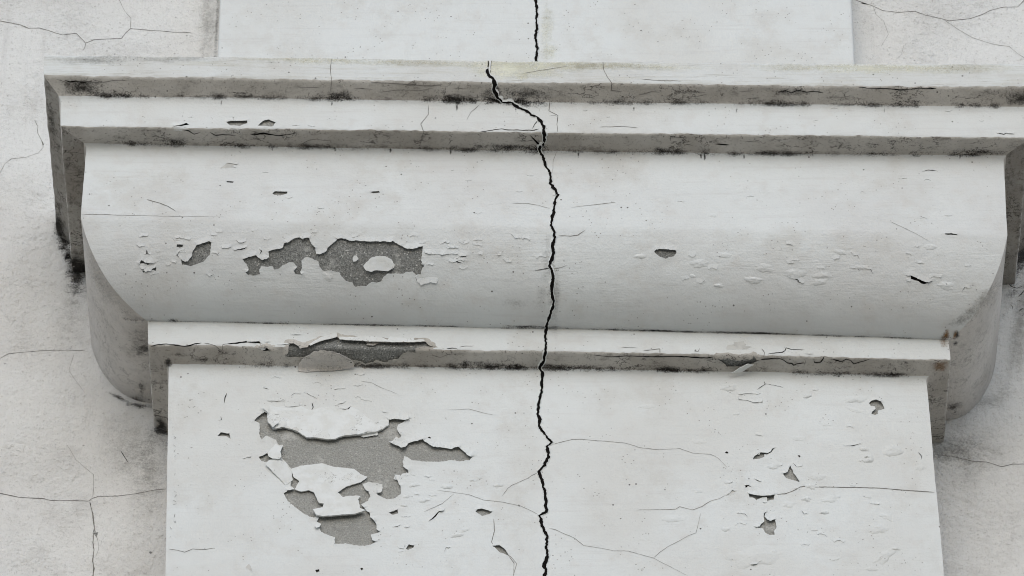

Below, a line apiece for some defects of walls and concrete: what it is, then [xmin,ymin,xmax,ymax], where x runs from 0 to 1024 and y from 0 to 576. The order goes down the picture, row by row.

crack [532,0,540,62]
water stain [67,82,125,97]
peeling [134,230,483,292]
peeling [649,244,697,264]
crack [357,60,724,576]
peeling [243,332,437,369]
peeling [864,395,889,419]
peeling [748,432,780,463]
peeling [242,383,479,554]
peeling [724,454,805,539]
crack [839,485,929,493]